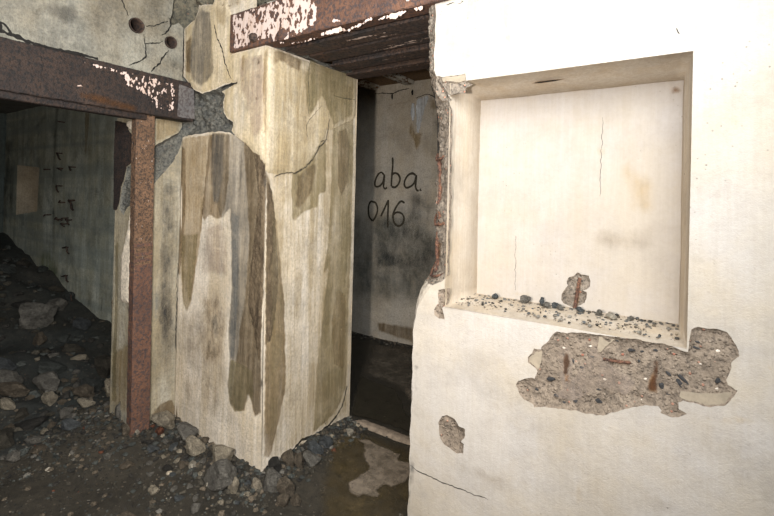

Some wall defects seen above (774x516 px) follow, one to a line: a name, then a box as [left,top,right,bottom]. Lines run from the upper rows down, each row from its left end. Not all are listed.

crack [0,21,98,60]
crack [129,19,185,77]
peeling [93,64,175,111]
crack [275,64,330,177]
flaking render [154,0,473,328]
flaking render [119,165,131,303]
spalling [561,273,590,309]
spalling [516,327,739,417]
spalling [438,415,465,454]
crack [413,467,487,499]